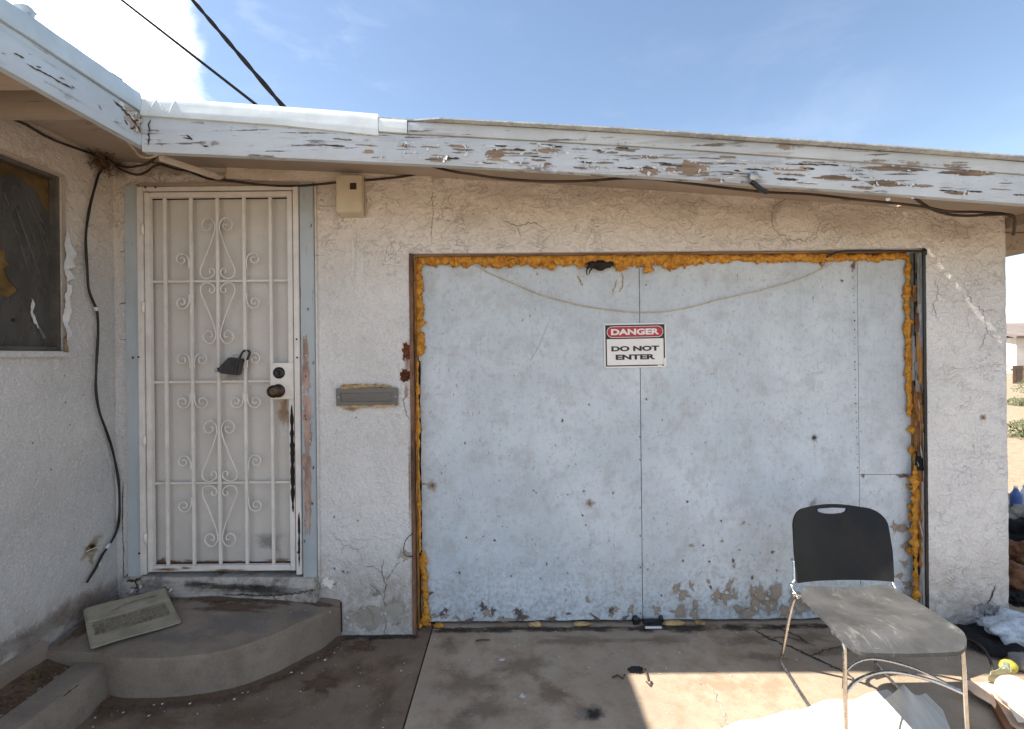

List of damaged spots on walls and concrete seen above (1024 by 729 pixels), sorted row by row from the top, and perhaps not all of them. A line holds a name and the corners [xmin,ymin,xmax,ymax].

peeling [119,101,143,134]
peeling [280,130,382,159]
peeling [398,141,1022,201]
peeling [301,335,314,543]
crack [337,539,400,634]
peeling [431,602,529,624]
peeling [585,549,816,623]